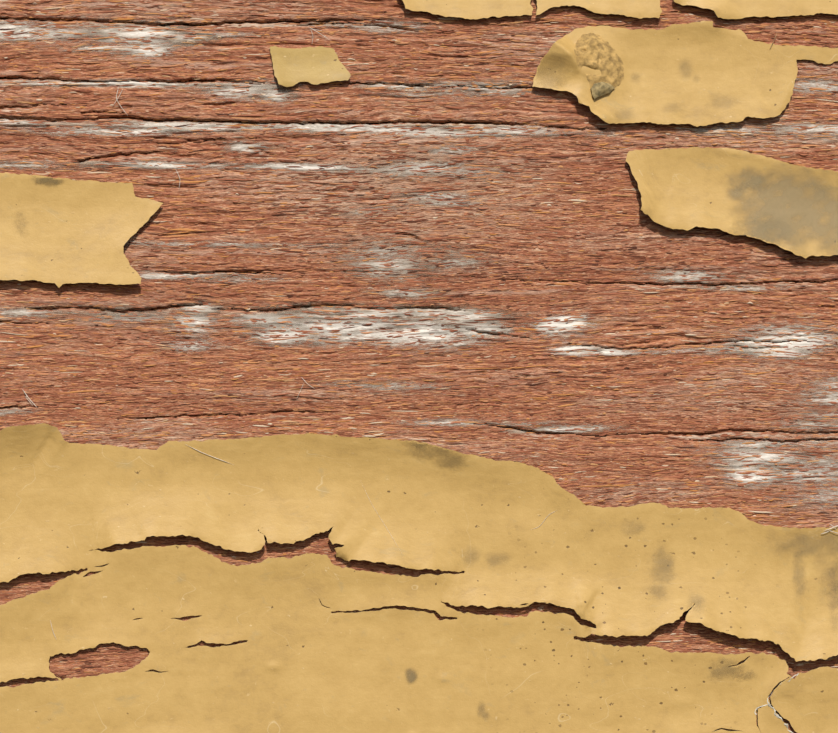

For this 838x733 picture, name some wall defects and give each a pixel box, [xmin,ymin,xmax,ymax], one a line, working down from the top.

peeling [270,46,351,87]
peeling [402,0,662,20]
peeling [532,0,838,127]
peeling [0,172,163,288]
peeling [625,147,838,259]
peeling [0,423,838,733]
crack [319,599,838,733]